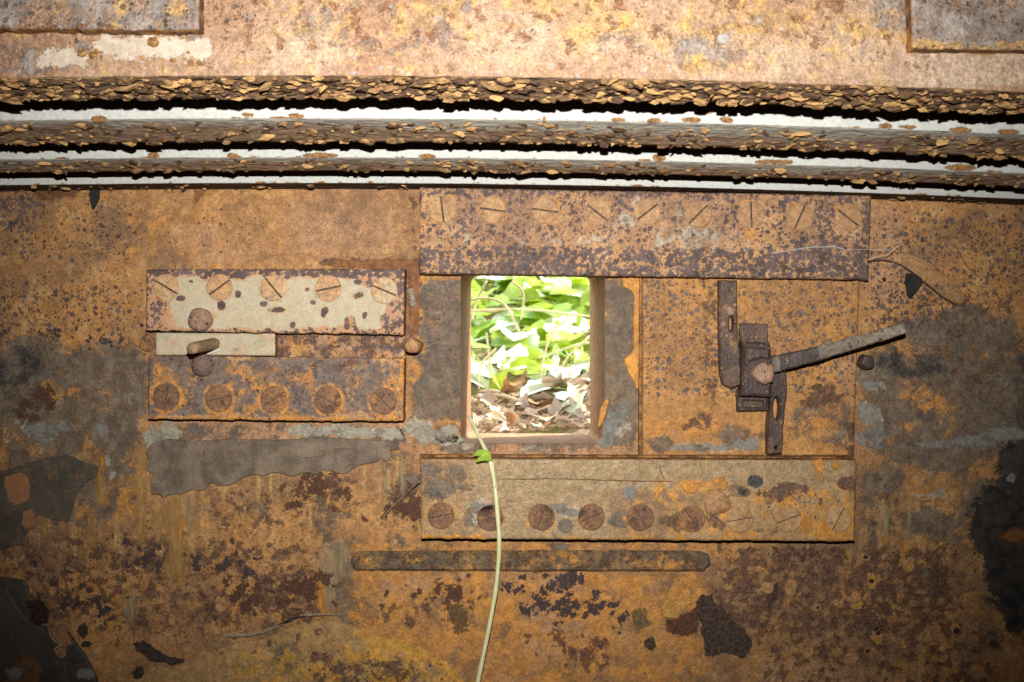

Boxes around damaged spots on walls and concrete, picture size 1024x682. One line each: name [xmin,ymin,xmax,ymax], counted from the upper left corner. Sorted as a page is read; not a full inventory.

rust [333,258,420,334]
rust [75,319,124,350]
peeling [0,455,99,550]
peeling [145,437,400,499]
rust [277,471,353,513]
rust [362,480,421,527]
peeling [0,577,98,682]
rust [35,563,115,626]
spalling [132,640,184,679]
rust [122,537,343,623]
rust [404,573,481,634]
rust [499,571,630,674]